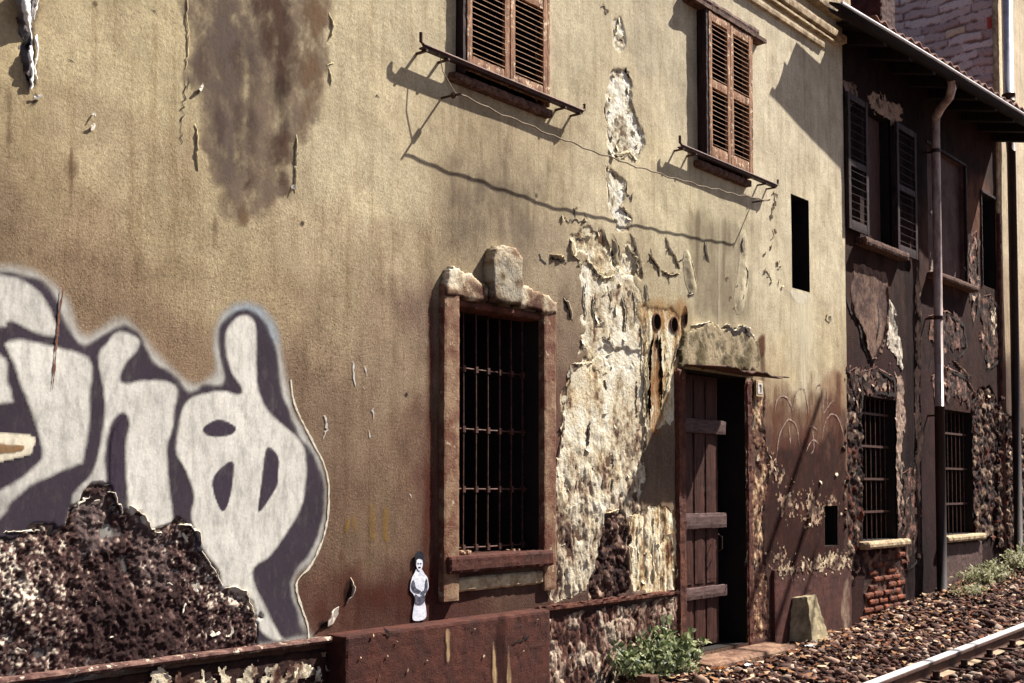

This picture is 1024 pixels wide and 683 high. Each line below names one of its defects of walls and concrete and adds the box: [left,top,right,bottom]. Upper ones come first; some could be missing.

peeling [16,0,43,104]
leakage [184,0,330,224]
flaking render [538,67,755,605]
corrosion [641,306,664,434]
spalling [744,231,1024,640]
flaking render [0,483,330,683]